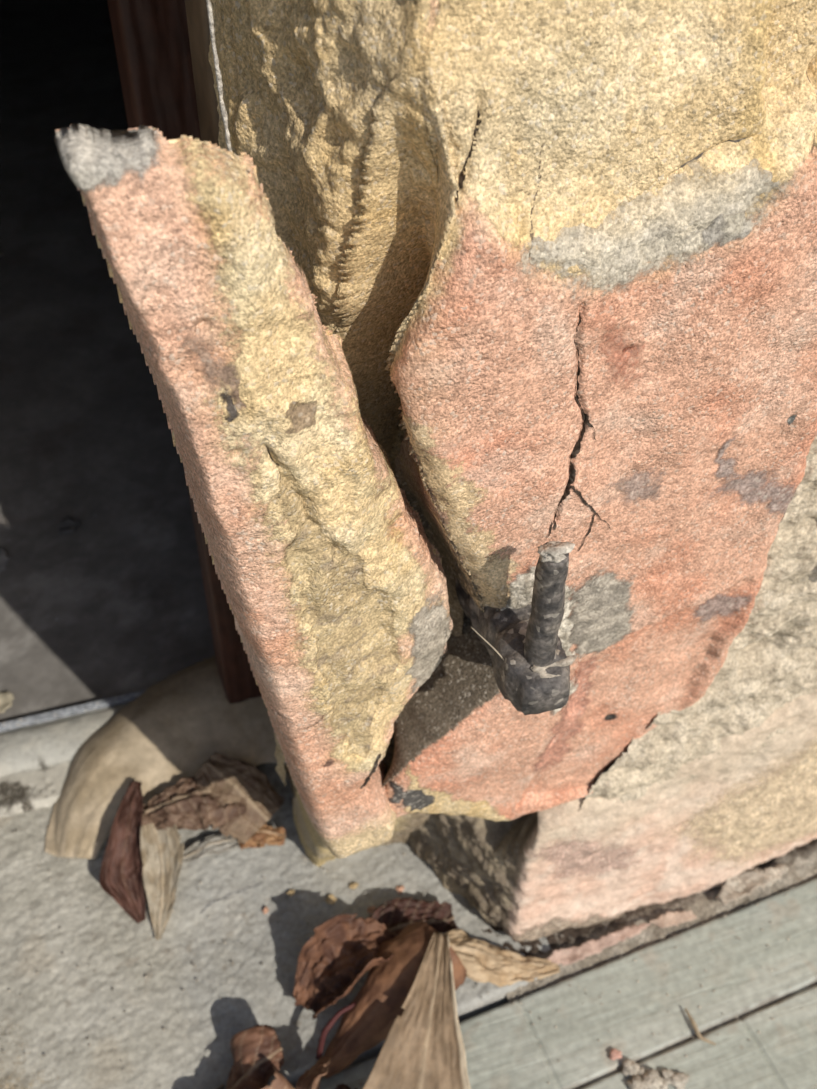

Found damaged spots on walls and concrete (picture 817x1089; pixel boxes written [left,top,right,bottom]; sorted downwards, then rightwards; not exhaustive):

crack [546,304,610,551]